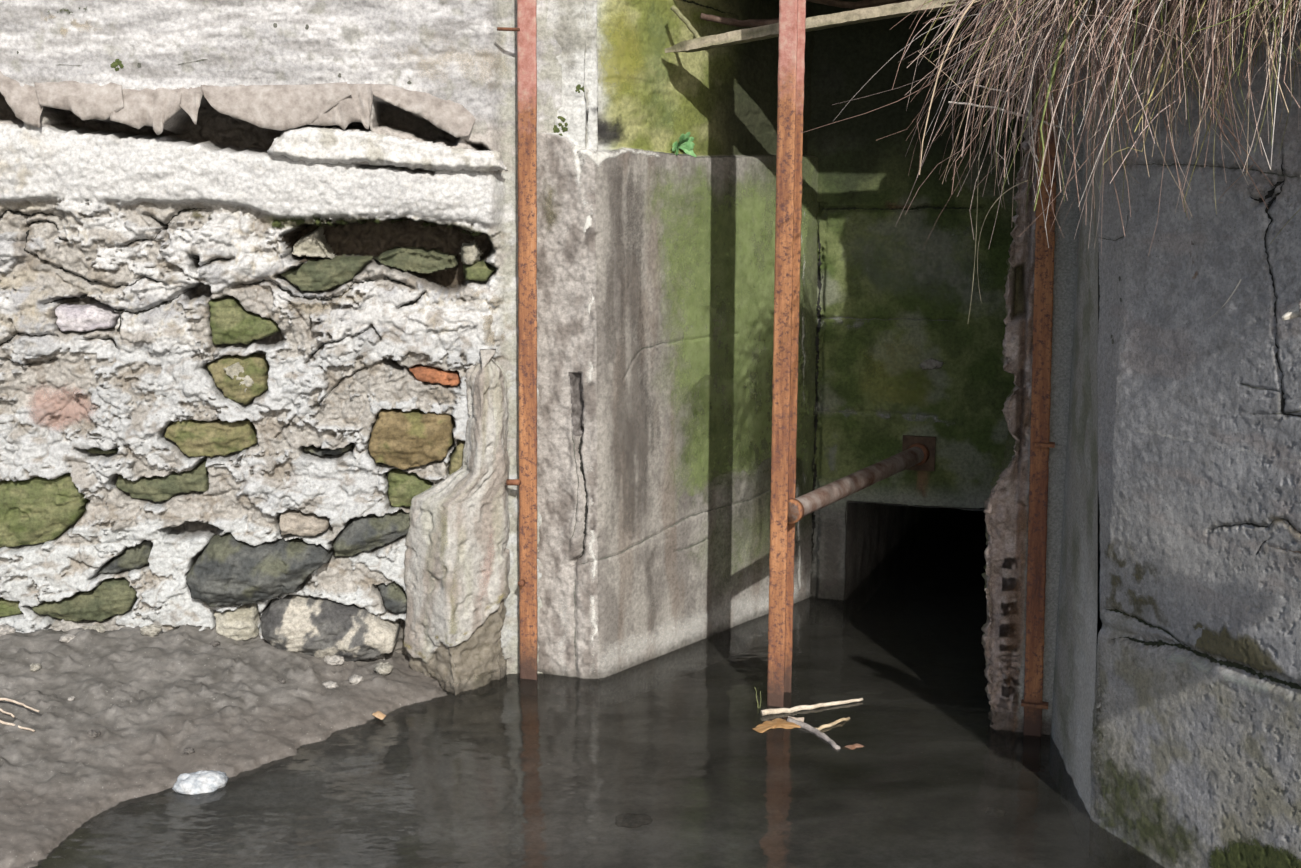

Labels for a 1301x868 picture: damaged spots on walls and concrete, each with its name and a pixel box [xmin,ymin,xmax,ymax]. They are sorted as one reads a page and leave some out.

flaking render [0,71,508,173]
spalling [282,219,491,289]
crack [1134,159,1301,417]
damp [611,182,654,524]
damp [683,354,750,482]
crack [1208,518,1301,555]
spalling [409,600,507,686]
spalling [989,488,1020,713]
damp [1106,545,1159,619]
crack [1106,609,1301,689]
damp [1193,623,1282,673]